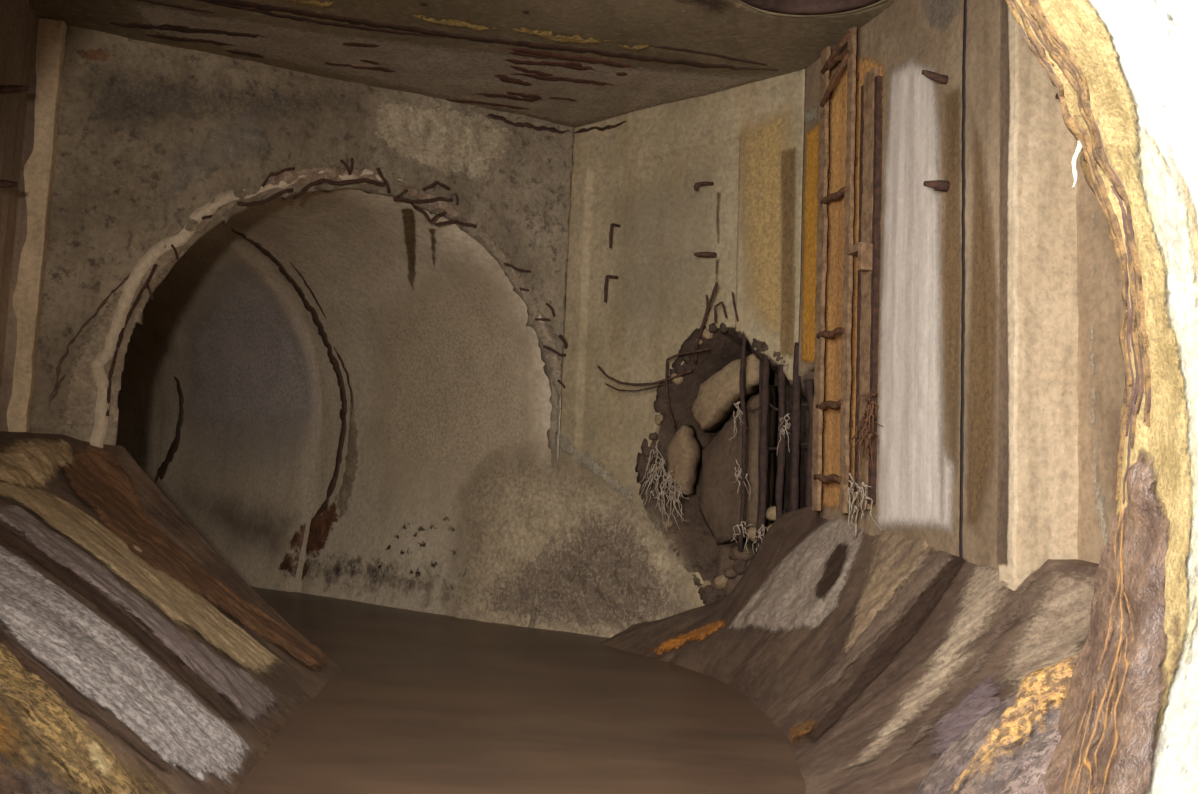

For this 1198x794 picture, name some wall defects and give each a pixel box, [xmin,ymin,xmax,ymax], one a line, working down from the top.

crack [231,229,347,517]
leakage [337,403,358,517]
flaking render [61,47,635,427]
leakage [293,558,431,589]
spalling [598,282,814,605]
corrosion [741,58,884,508]